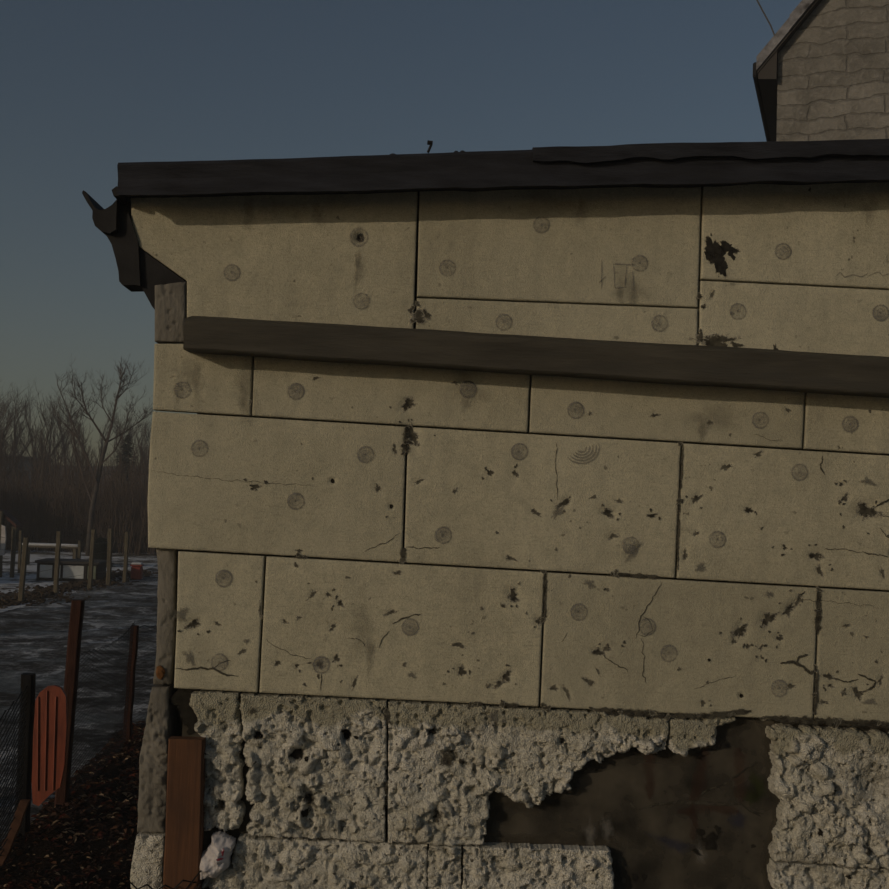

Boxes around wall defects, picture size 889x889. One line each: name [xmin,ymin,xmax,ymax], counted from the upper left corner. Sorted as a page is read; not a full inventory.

spalling [486,664,516,689]
spalling [492,716,776,889]